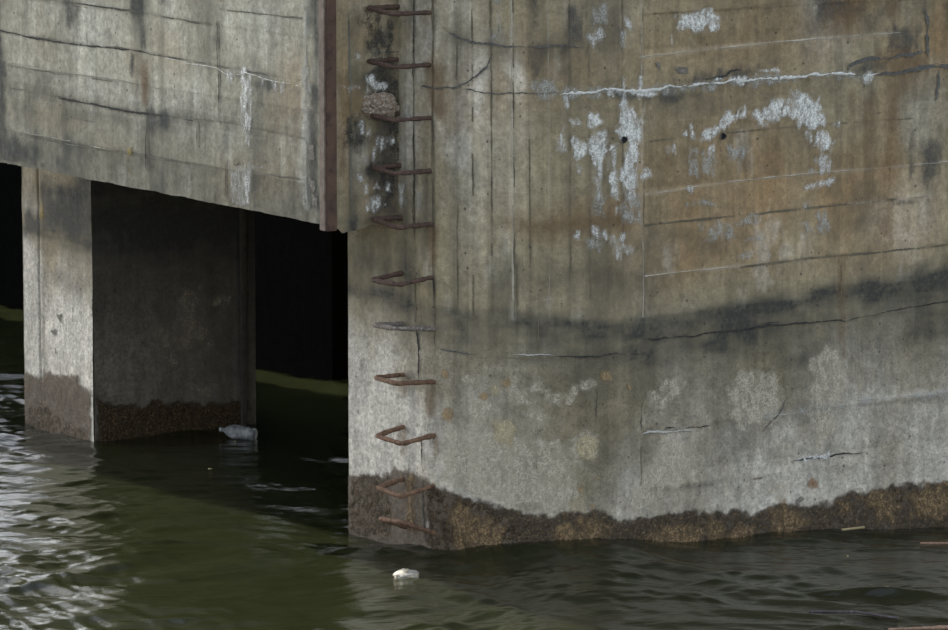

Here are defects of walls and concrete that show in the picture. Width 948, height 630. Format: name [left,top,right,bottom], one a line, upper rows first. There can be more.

crack [0,23,297,120]
water stain [366,15,399,95]
crack [412,3,948,107]
water stain [677,9,719,31]
crack [59,98,197,168]
water stain [359,106,409,215]
water stain [560,91,650,223]
water stain [684,90,834,189]
crack [416,280,475,378]
crack [514,301,948,358]
crack [640,403,710,435]